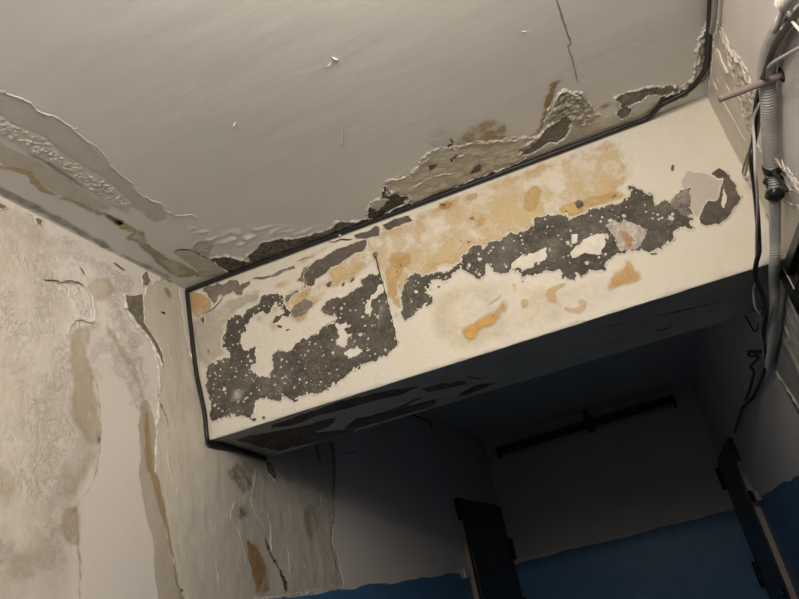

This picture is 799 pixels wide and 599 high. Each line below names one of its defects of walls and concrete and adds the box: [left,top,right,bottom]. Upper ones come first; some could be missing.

crack [556,0,578,82]
peeling [0,91,198,219]
leakage [369,179,550,307]
spalling [174,21,769,423]
leakage [561,147,624,215]
peeling [780,159,799,254]
peeling [0,202,440,599]
leakage [189,292,257,364]
peeling [773,292,799,415]
leakage [139,401,184,599]